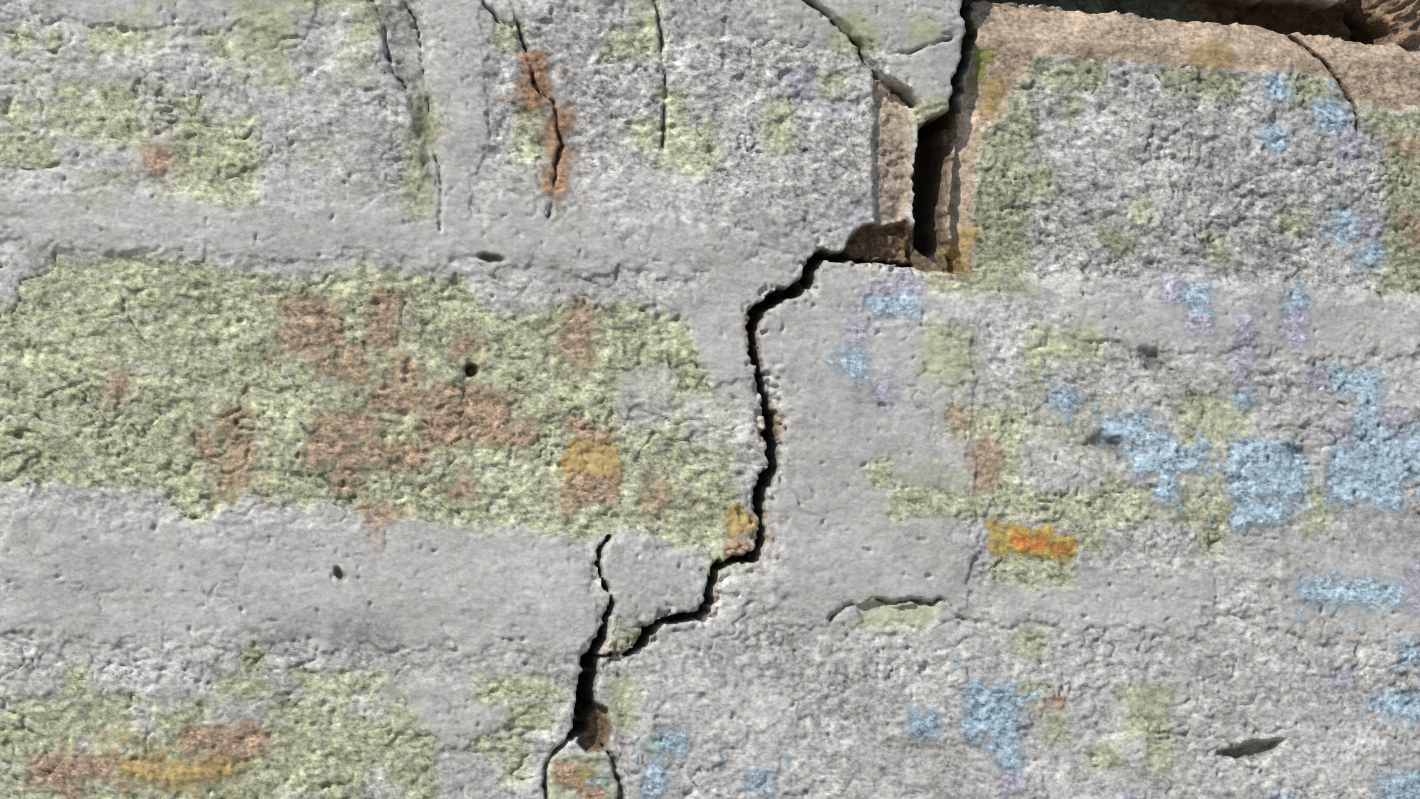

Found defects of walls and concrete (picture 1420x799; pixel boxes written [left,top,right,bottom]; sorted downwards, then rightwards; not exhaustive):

crack [369,0,447,235]
corrosion [516,50,574,197]
spalling [873,80,925,226]
spalling [949,0,1420,299]
crack [539,0,981,799]
spalling [0,641,440,799]